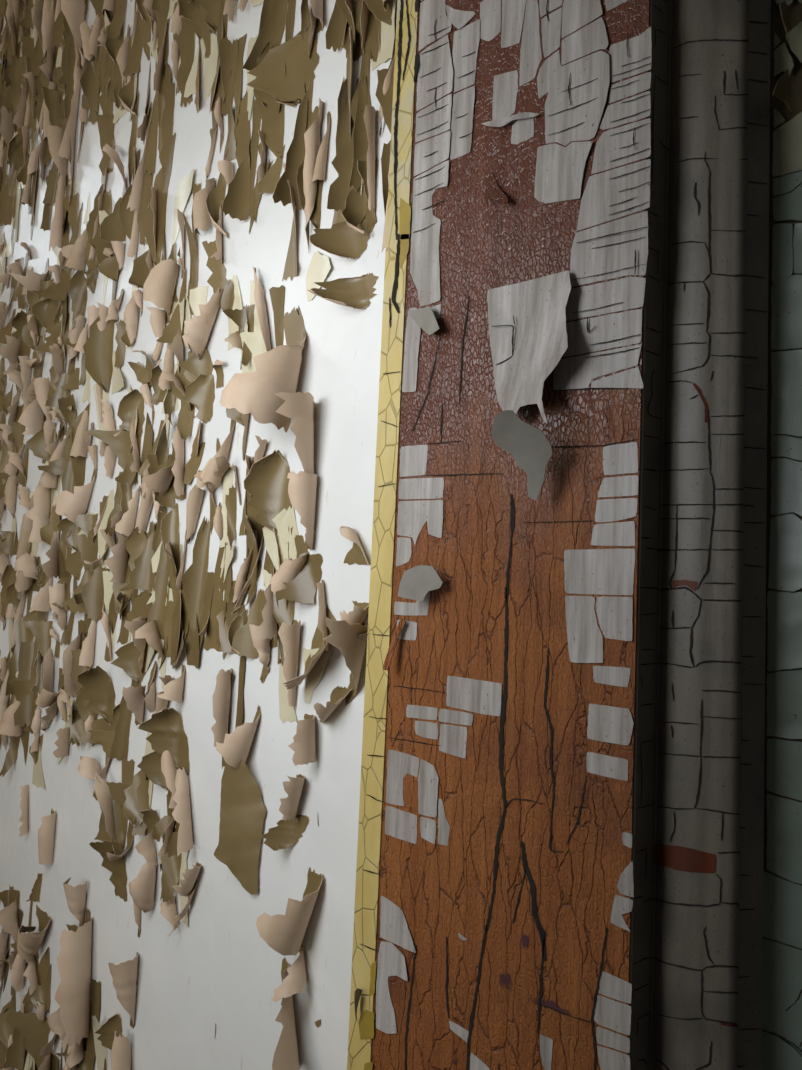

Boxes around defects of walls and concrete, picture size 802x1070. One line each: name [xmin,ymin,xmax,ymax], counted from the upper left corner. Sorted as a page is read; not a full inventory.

crack [389,0,475,327]
crack [382,296,515,444]
peeling [0,0,652,937]
crack [547,0,802,1070]
peeling [762,0,802,1070]
crack [368,716,441,757]
crack [426,473,608,1070]
peeling [0,884,89,1070]
peeling [354,896,416,1040]
crack [404,945,417,1070]
peeling [449,1020,490,1070]
peeling [594,971,632,1070]